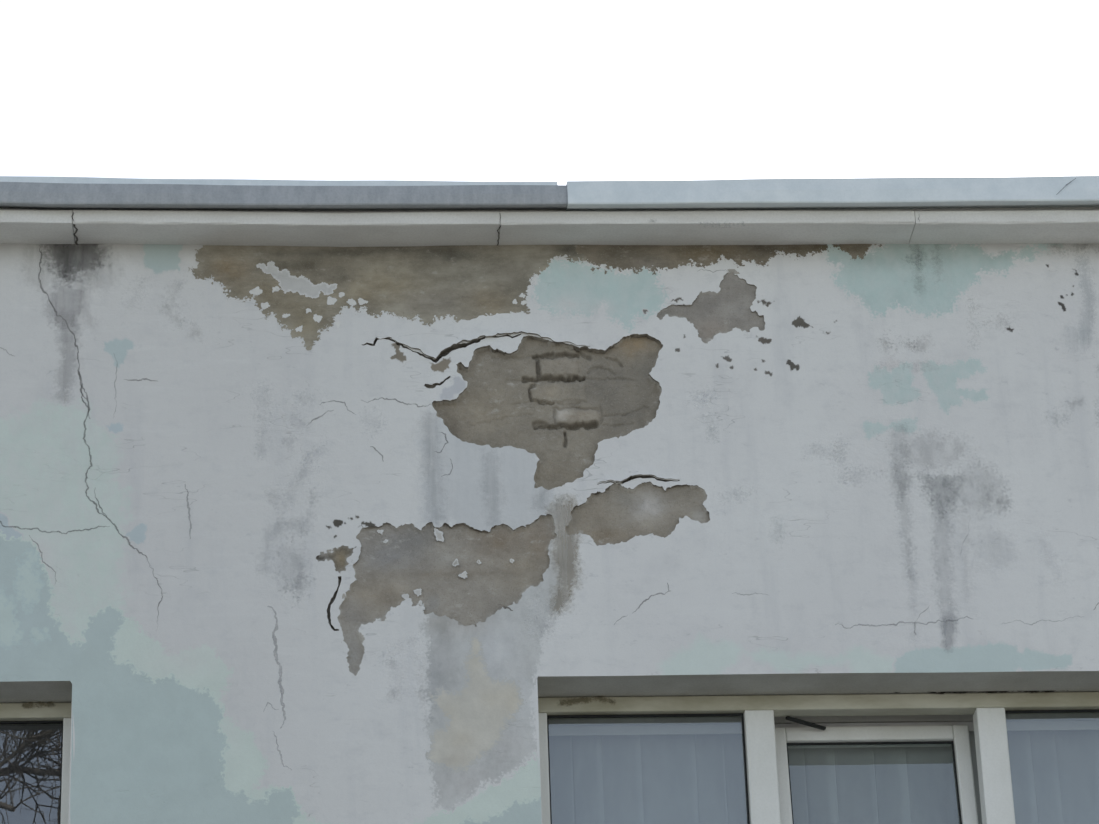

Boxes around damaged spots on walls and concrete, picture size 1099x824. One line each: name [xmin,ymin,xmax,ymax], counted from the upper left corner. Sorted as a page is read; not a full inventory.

crack [362,334,521,388]
flaking render [188,244,1068,490]
spalling [1057,268,1079,312]
peeling [0,389,302,824]
flaking render [316,481,710,676]